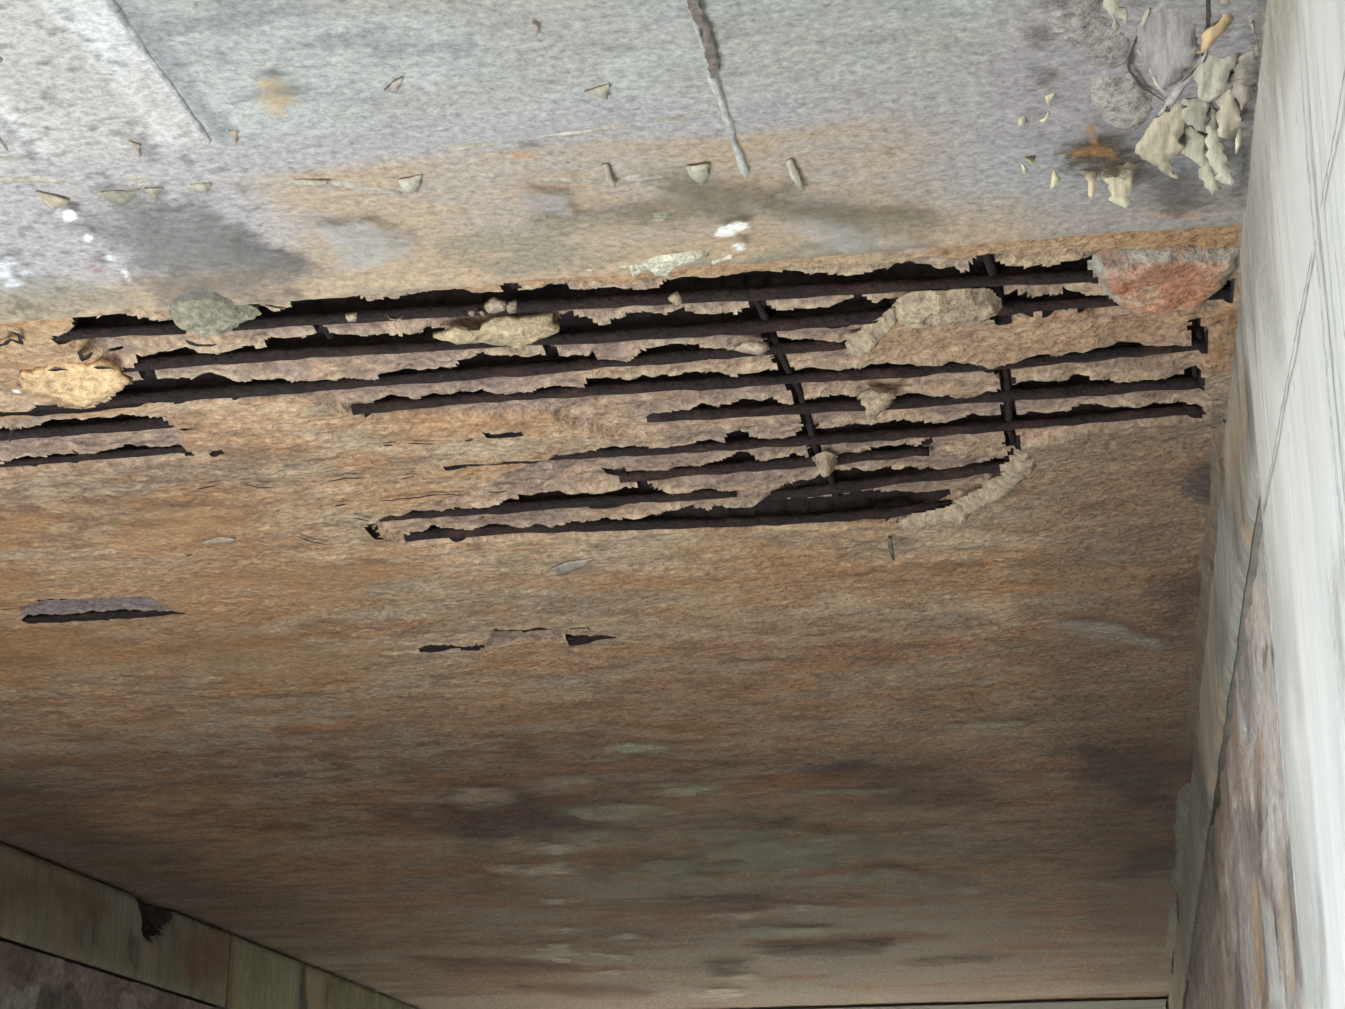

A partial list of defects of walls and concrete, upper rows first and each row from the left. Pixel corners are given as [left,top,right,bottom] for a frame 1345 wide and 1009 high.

peeling [1018,93,1055,128]
peeling [1079,0,1261,209]
peeling [686,163,709,188]
peeling [786,158,805,192]
peeling [1020,155,1036,174]
spalling [0,243,1242,546]
spalling [15,596,185,624]
spalling [416,627,616,654]
damp [443,787,626,879]
damp [590,818,894,920]
efflorescence [525,927,582,963]
damp [698,960,757,999]